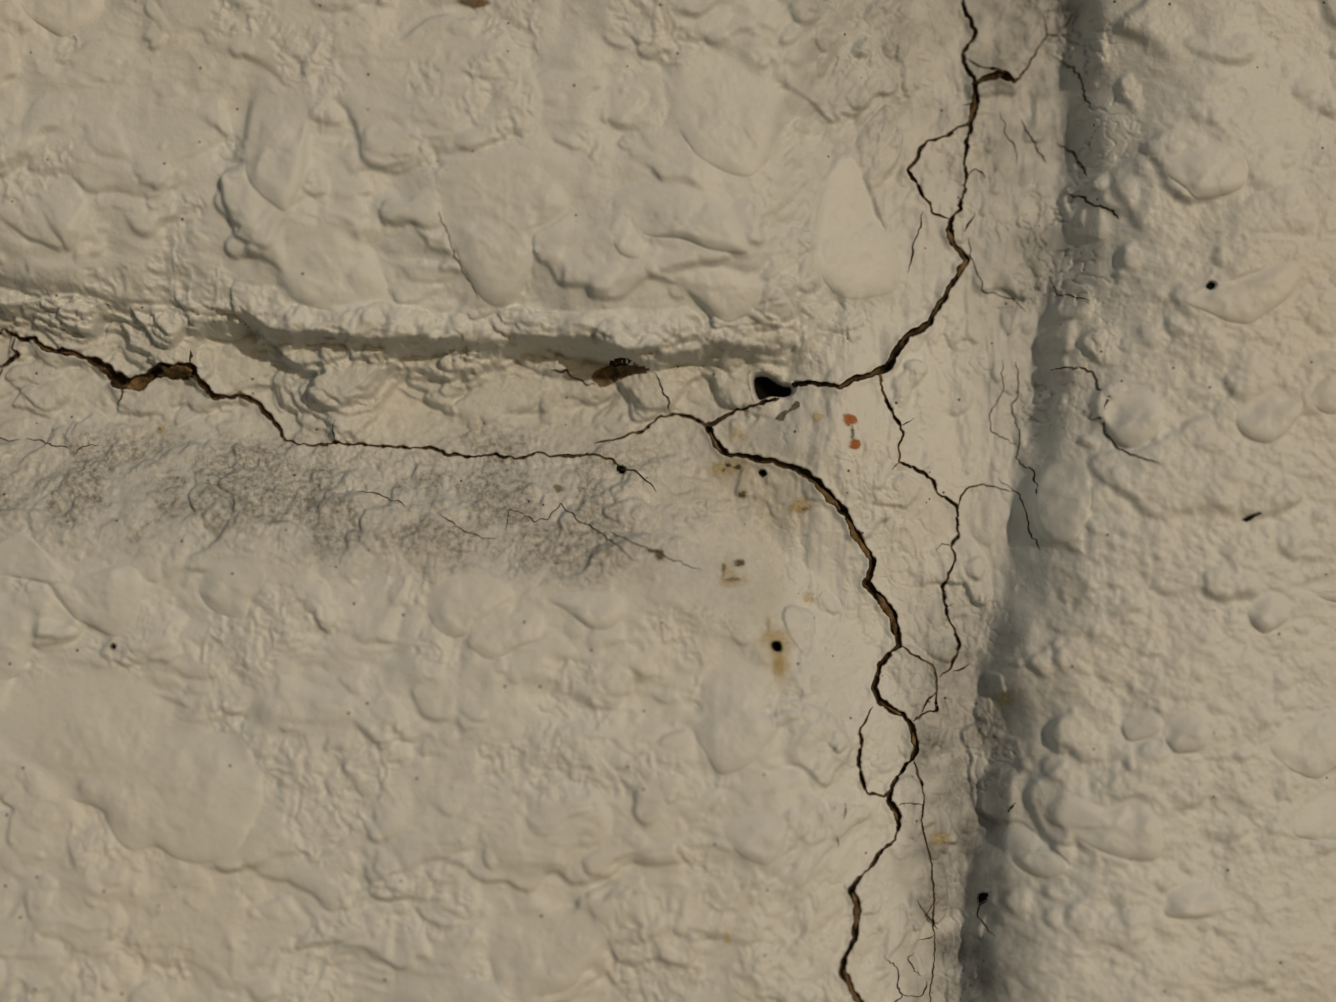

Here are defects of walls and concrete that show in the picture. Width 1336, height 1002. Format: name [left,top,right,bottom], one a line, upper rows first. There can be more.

crack [1051,54,1091,108]
crack [999,111,1119,219]
crack [439,213,479,299]
crack [1049,278,1087,300]
crack [0,328,657,492]
crack [1051,366,1160,464]
crack [357,491,406,507]
crack [443,503,699,569]
crack [596,0,1071,1002]